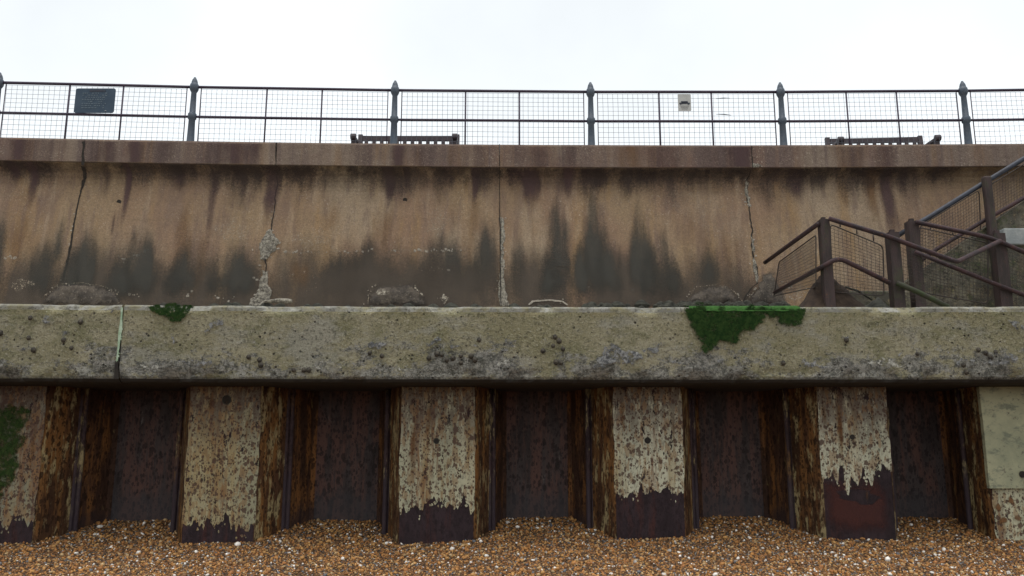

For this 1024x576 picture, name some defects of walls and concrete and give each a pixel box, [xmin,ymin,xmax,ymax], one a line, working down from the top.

crack [60,141,87,281]
crack [271,142,279,231]
spalling [249,229,374,306]
leakage [0,206,754,308]
crack [743,146,758,301]
peeling [182,386,261,539]
peeling [399,387,476,520]
peeling [613,387,684,503]
peeling [817,387,892,495]